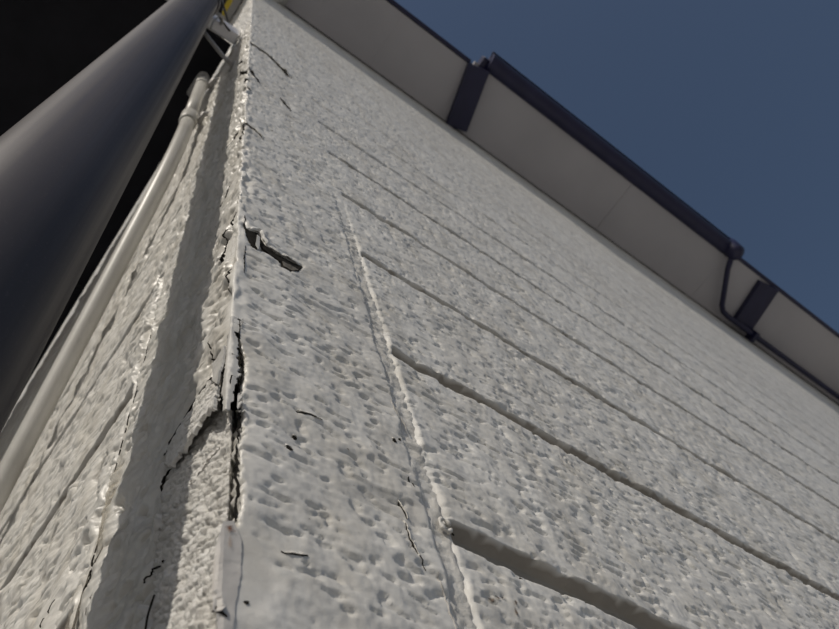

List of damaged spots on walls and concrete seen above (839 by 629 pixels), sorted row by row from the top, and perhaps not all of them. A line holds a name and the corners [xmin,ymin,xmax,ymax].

crack [249,42,293,84]
crack [239,122,265,142]
peeling [219,213,303,294]
crack [114,385,138,473]
spalling [143,316,244,629]
crack [71,500,108,629]
crack [397,499,457,629]